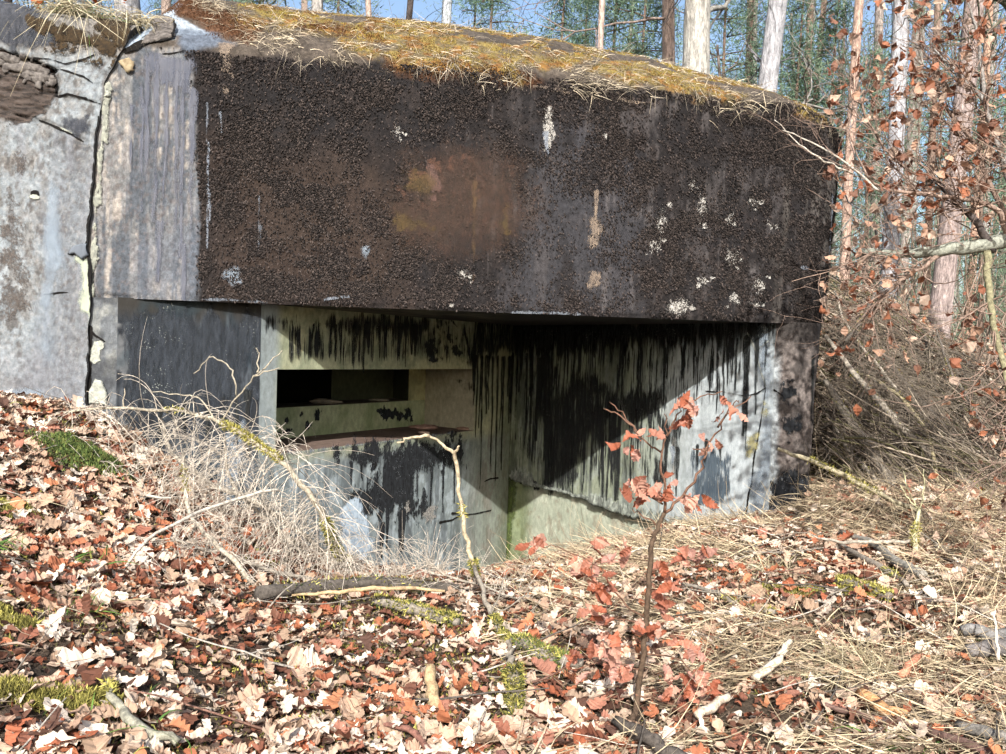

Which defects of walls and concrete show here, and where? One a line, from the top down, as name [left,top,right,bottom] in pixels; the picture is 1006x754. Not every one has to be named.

crack [123,18,182,54]
spalling [0,50,58,124]
crack [0,50,105,406]
water stain [668,298,695,316]
water stain [330,321,422,373]
water stain [278,408,322,435]
water stain [376,406,413,422]
water stain [451,320,652,501]
water stain [289,430,467,560]
water stain [664,429,680,496]